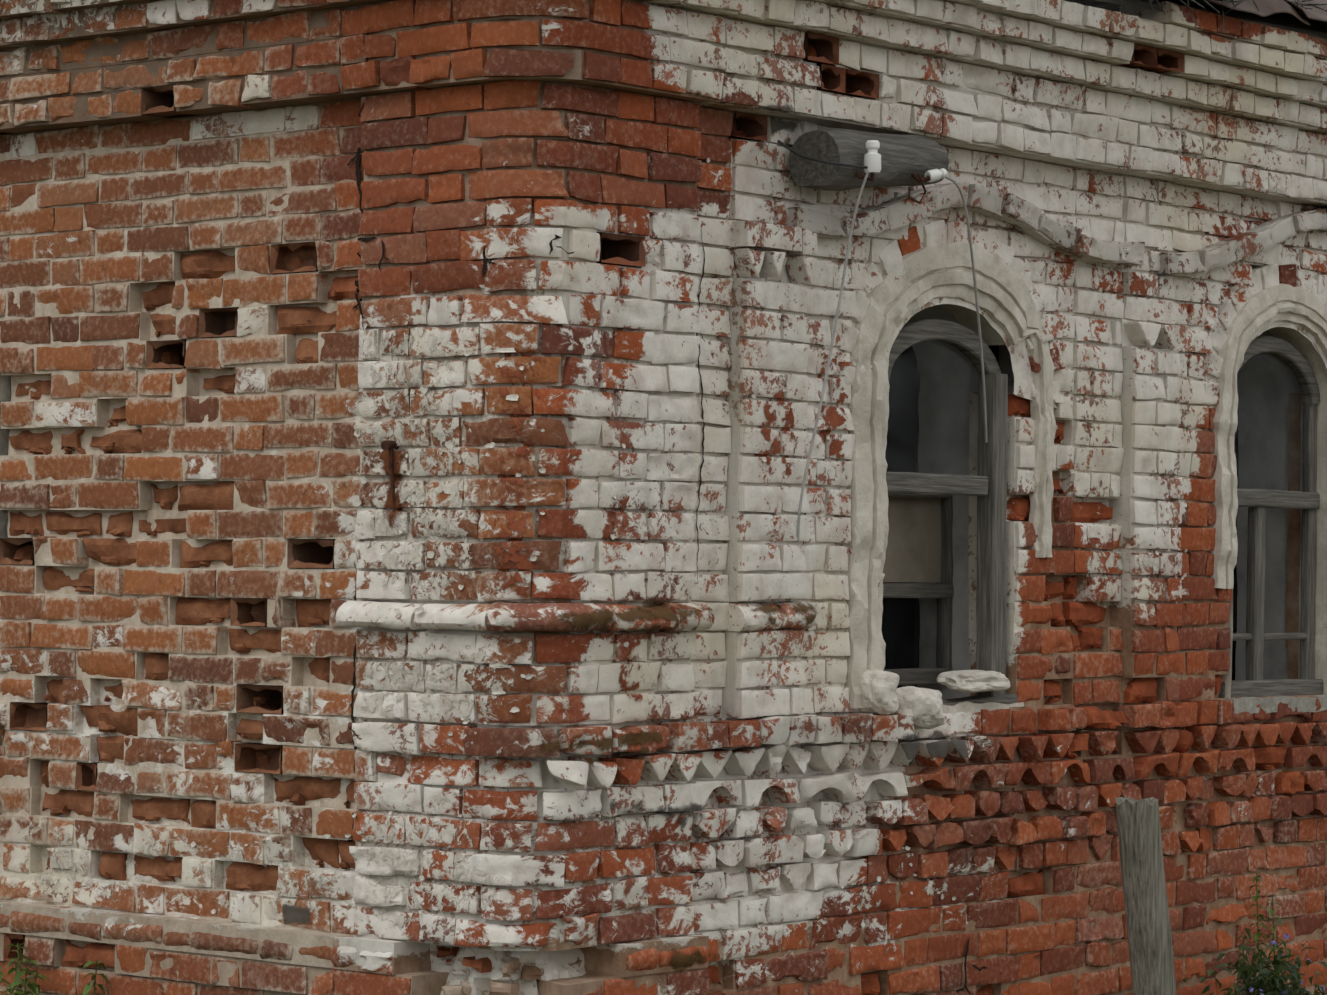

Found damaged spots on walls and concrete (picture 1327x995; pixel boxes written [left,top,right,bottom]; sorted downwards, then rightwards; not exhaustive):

spalling [1118,43,1184,74]
spalling [728,112,767,141]
spalling [270,242,318,274]
spalling [596,232,645,267]
spalling [276,276,362,364]
peeling [354,321,547,614]
spalling [1053,479,1113,522]
spalling [287,540,335,569]
spalling [1044,544,1188,651]
peeling [360,638,532,736]
peeling [612,642,650,712]
peeling [857,846,956,927]